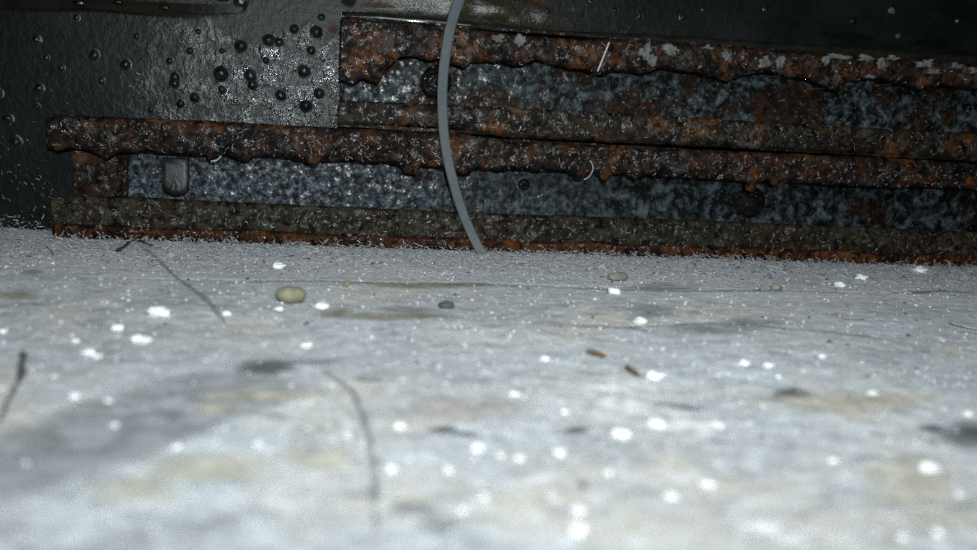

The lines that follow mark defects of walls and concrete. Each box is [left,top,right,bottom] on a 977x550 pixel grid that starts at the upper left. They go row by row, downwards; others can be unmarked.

damp [342,0,546,27]
rust [339,17,977,92]
rust [46,115,977,192]
crack [114,239,153,252]
rust [52,223,977,267]